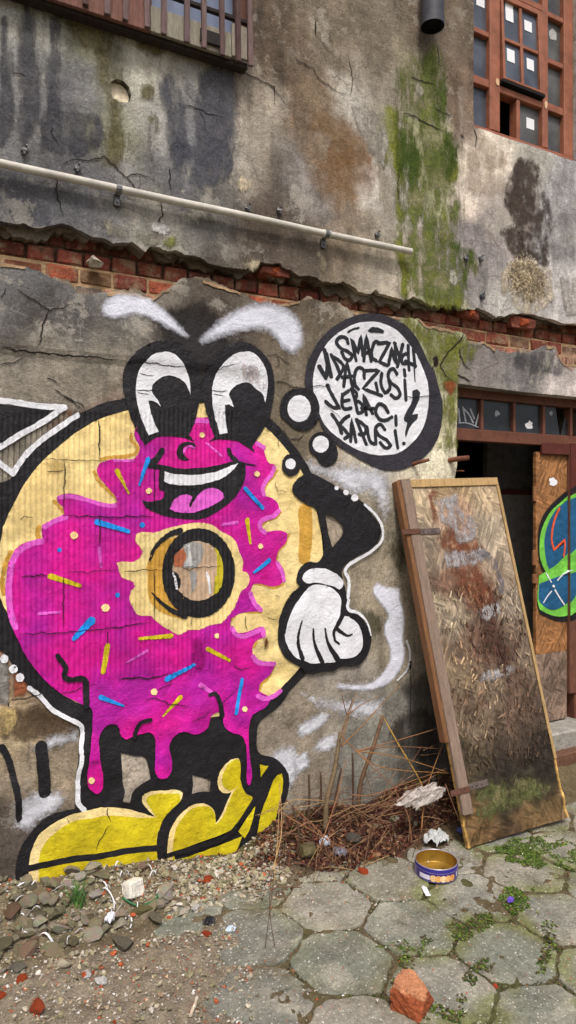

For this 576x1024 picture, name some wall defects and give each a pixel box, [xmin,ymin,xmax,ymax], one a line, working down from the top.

leakage [0,5,124,165]
crack [50,127,171,222]
spalling [151,222,170,237]
leakage [142,65,237,188]
crack [245,72,287,105]
leakage [502,157,552,267]
spalling [0,225,576,369]
crack [0,288,183,543]